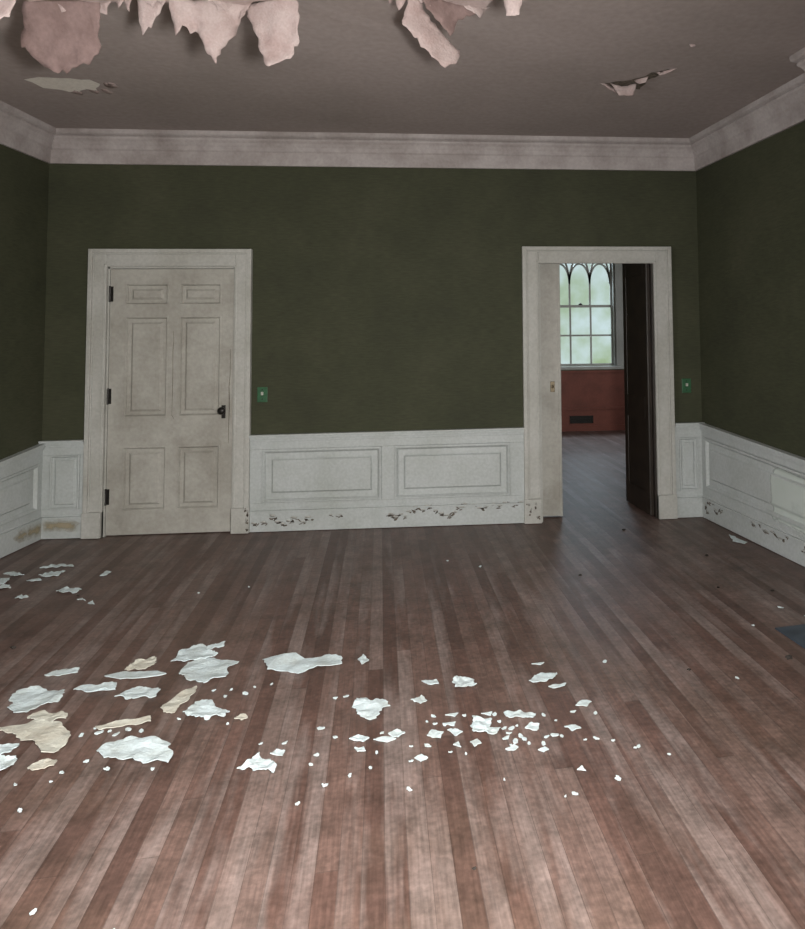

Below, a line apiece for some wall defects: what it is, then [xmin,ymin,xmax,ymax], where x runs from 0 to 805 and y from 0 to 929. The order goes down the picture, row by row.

peeling [504,0,525,16]
peeling [0,0,300,95]
peeling [388,0,492,68]
peeling [600,69,675,96]
peeling [387,501,540,521]